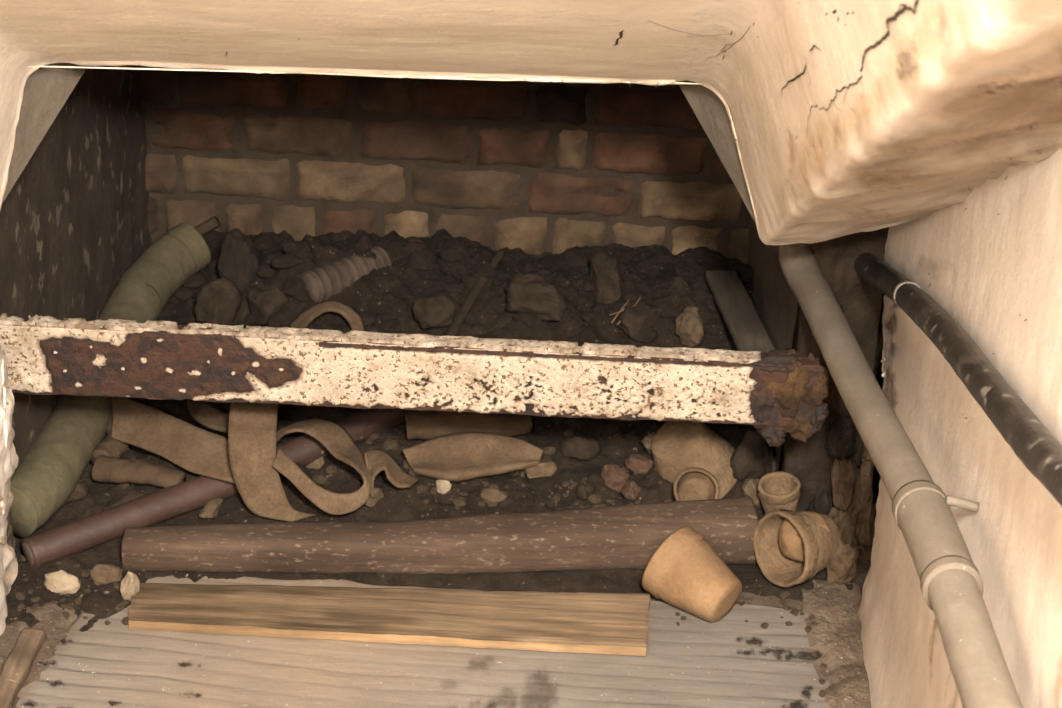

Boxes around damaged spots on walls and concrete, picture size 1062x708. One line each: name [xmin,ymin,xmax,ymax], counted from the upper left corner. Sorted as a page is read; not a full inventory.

crack [782,0,922,126]
leakage [860,53,1062,189]
rust [40,332,301,400]